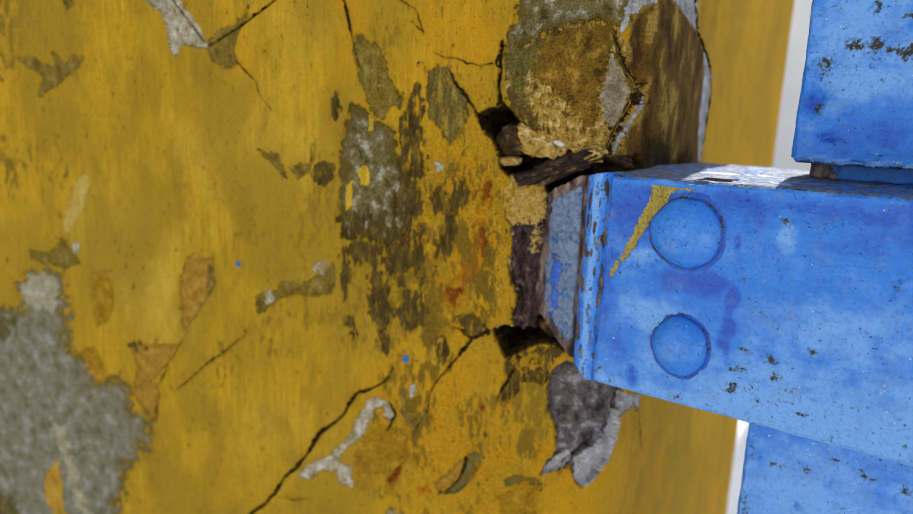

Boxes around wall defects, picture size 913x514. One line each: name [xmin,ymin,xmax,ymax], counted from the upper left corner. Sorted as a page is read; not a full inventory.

spalling [145,0,250,69]
crack [209,0,276,45]
crack [342,0,362,71]
spalling [502,0,636,157]
leakage [335,61,470,356]
spalling [0,174,176,514]
peeling [255,260,336,314]
crack [250,367,396,514]
spalling [299,384,427,500]
crack [411,313,490,439]
crack [496,327,523,402]
spalling [500,337,641,487]